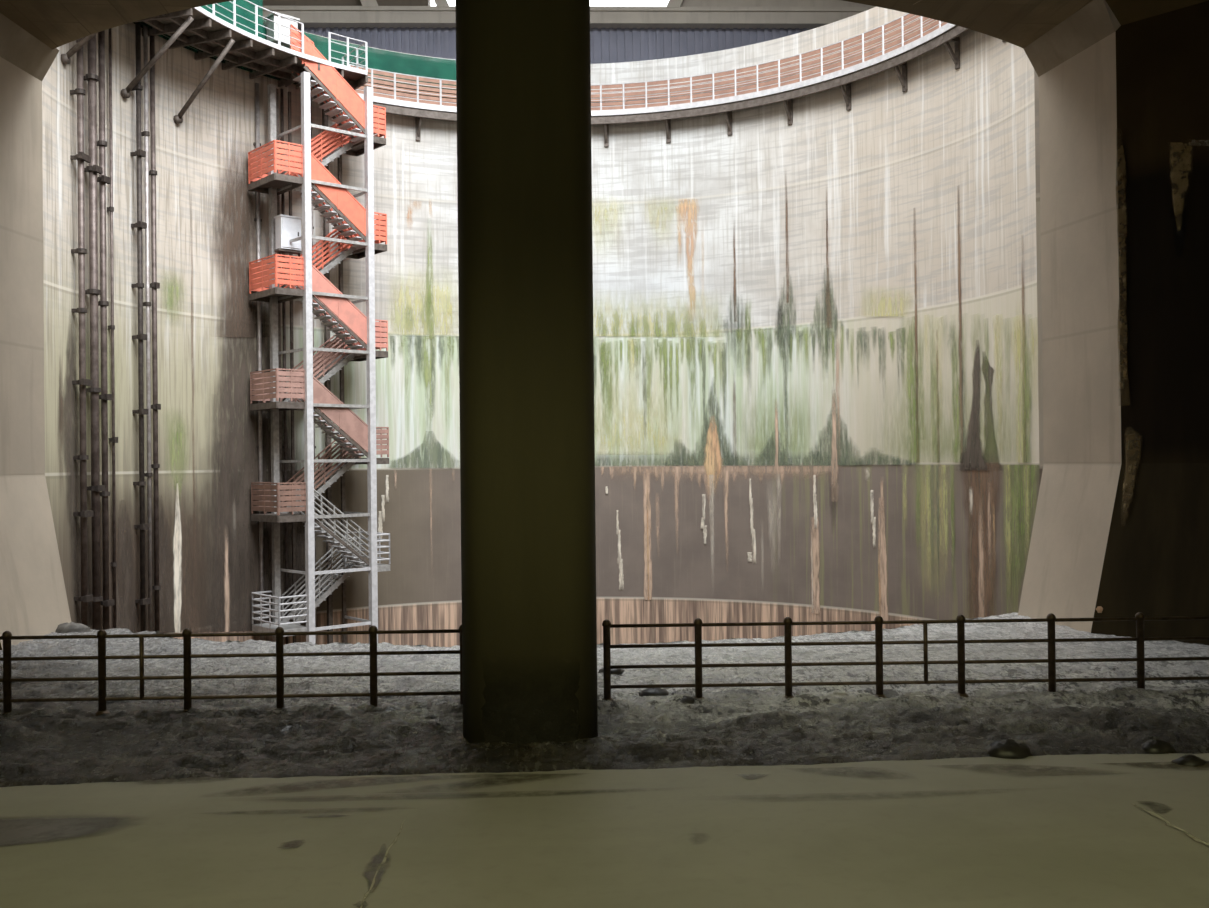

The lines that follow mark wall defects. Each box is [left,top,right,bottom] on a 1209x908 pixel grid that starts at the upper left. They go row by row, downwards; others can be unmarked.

water stain [59,161,306,633]
water stain [391,247,459,412]
corrosion [679,200,697,306]
water stain [594,198,912,621]
water stain [917,346,1028,618]
peeling [1170,140,1209,250]